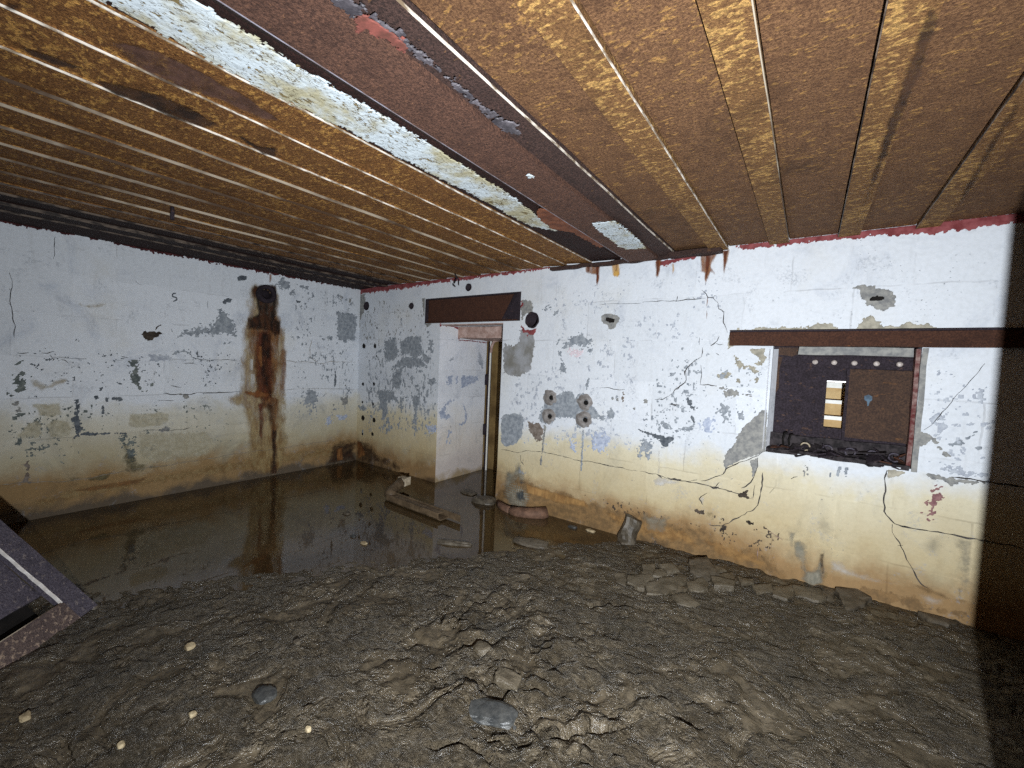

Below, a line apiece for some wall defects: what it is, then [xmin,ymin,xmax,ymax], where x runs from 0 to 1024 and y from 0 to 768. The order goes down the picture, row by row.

peeling [98,0,557,231]
peeling [6,298,239,484]
rust [231,275,286,473]
peeling [275,277,488,444]
peeling [500,285,838,477]
rust [701,250,729,281]
spalling [852,284,937,329]
leakage [331,441,396,468]
crack [507,450,781,559]
leakage [791,534,822,585]
crack [883,471,1023,588]